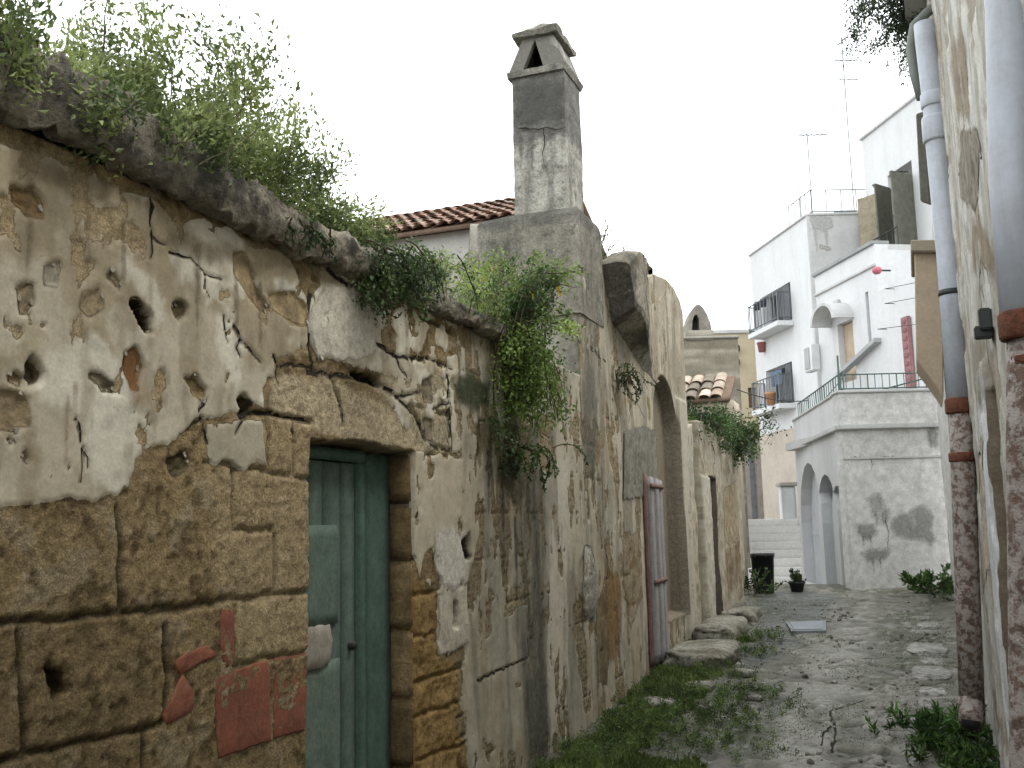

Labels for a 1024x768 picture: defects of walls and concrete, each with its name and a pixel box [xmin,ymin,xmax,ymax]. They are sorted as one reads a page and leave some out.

crack [519,127,565,170]
hole [129,296,151,332]
flaking render [171,303,184,317]
flaking render [233,251,316,334]
crack [149,198,452,452]
flaking render [90,373,114,392]
flaking render [123,349,139,391]
flaking render [0,362,33,464]
hole [236,398,253,414]
leakage [858,493,934,563]
flaking render [595,583,610,685]
crack [477,658,527,682]